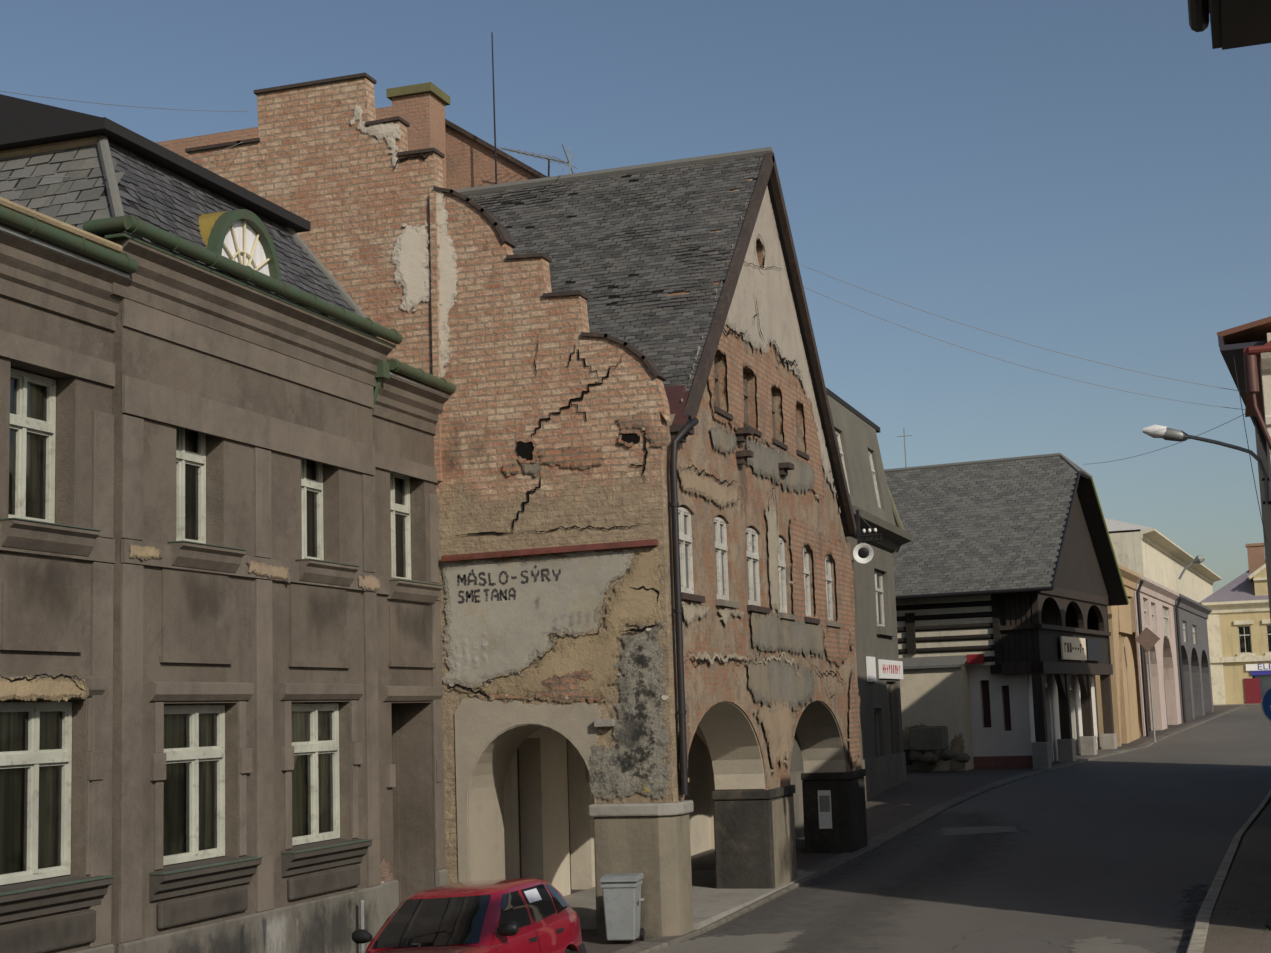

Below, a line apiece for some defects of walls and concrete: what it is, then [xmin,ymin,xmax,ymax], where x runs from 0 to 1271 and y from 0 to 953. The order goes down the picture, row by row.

flaking render [350,103,403,168]
flaking render [392,190,459,378]
crack [531,344,622,437]
flaking render [708,186,841,513]
crack [463,471,652,535]
flaking render [0,675,89,702]
crack [448,569,659,699]
flaking render [442,546,690,801]
damp [617,645,656,778]
crack [684,651,849,697]
flaking render [681,503,861,774]
damp [263,917,286,953]